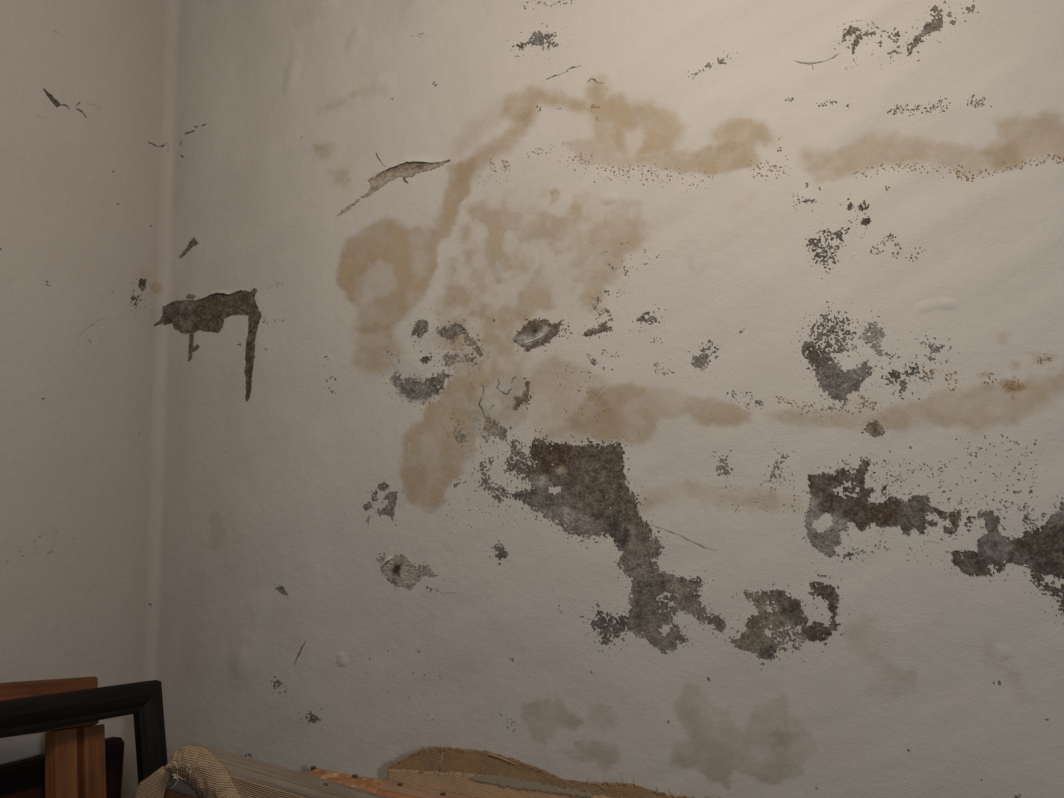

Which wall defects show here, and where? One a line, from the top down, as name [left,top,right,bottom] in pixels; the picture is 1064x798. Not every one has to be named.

flaking render [512,23,559,59]
flaking render [834,1,975,70]
leakage [887,98,951,116]
leakage [338,149,493,322]
flaking render [154,287,284,401]
flaking render [386,310,489,410]
flaking render [511,317,569,351]
flaking render [793,301,959,412]
leakage [402,338,517,518]
flaking render [376,545,442,595]
flaking render [452,378,1064,670]
leakage [870,434,1047,529]